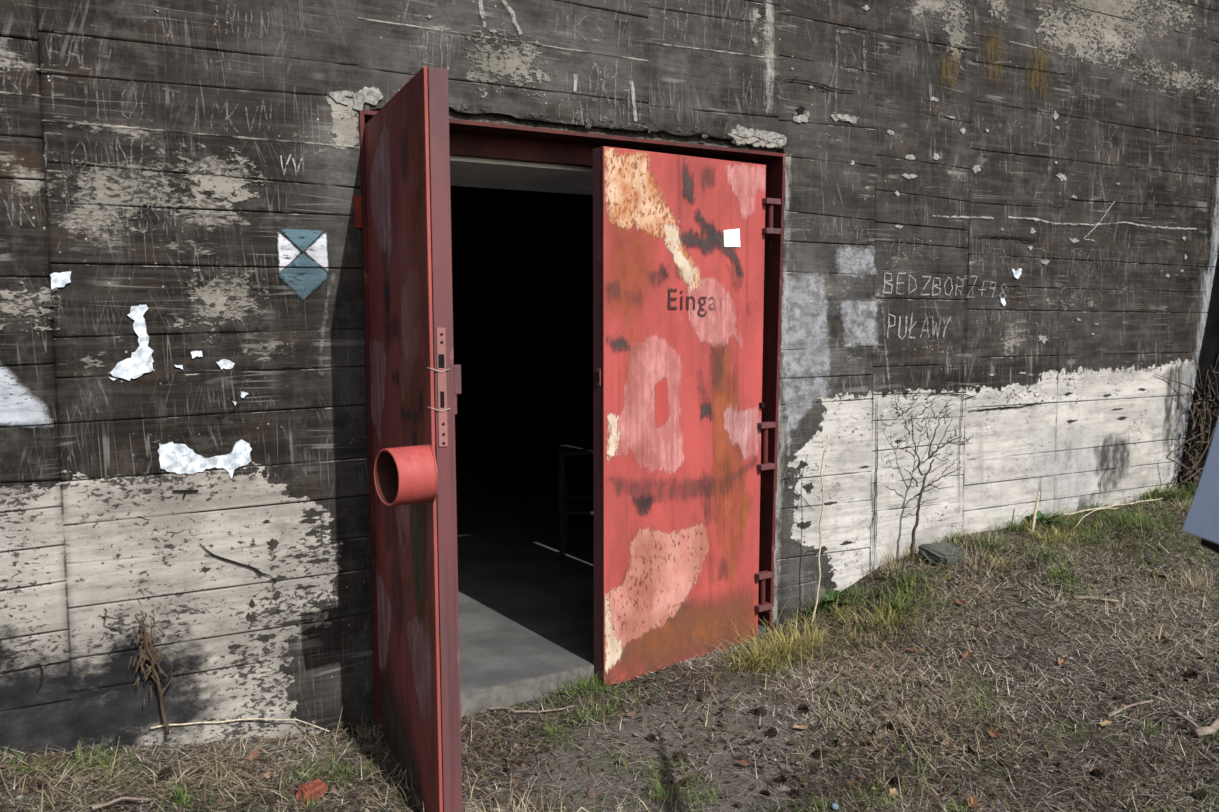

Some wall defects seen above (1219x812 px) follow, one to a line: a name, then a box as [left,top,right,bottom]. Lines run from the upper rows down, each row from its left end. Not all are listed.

peeling [326,86,383,150]
spalling [449,22,787,153]
spalling [792,106,810,124]
rust [604,147,706,292]
peeling [787,358,1197,591]
peeling [0,462,343,750]